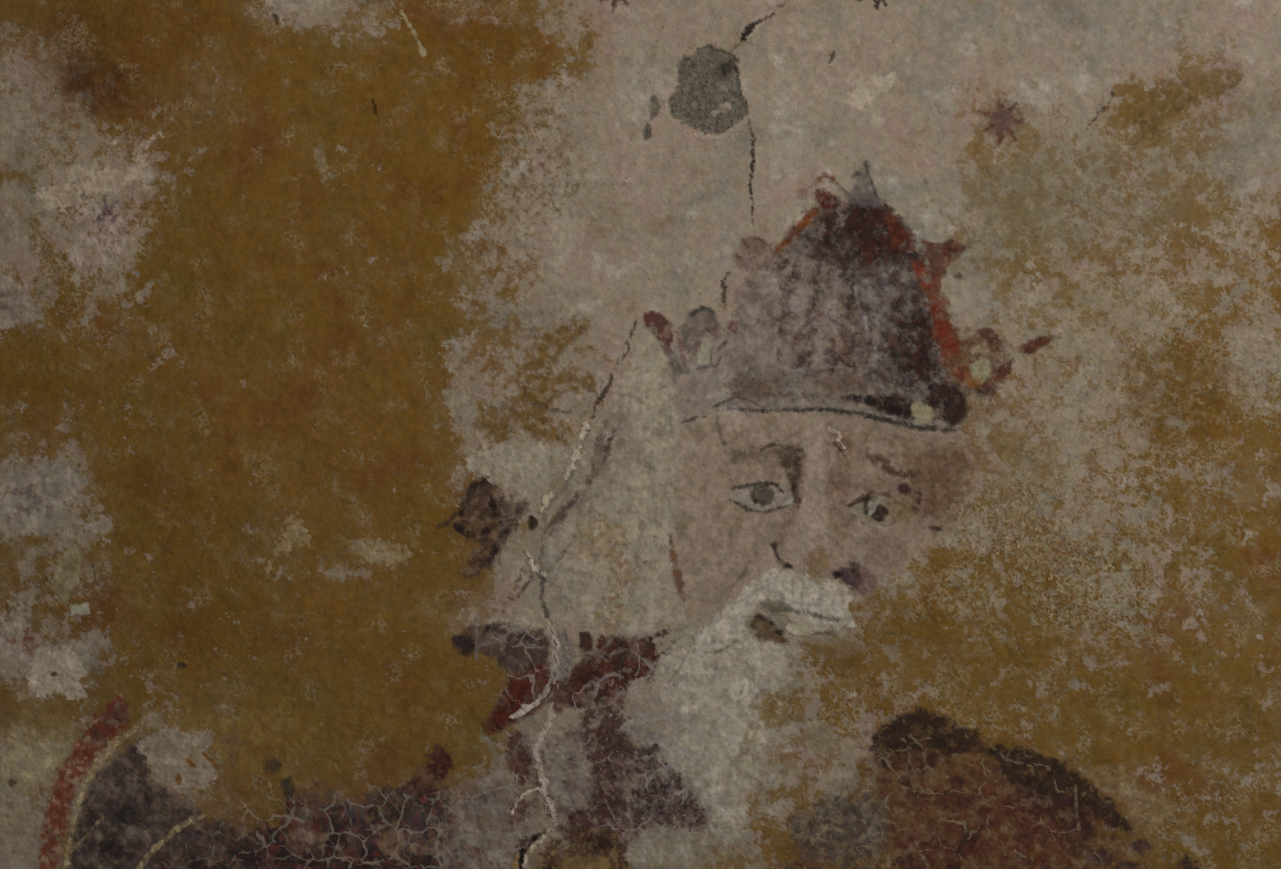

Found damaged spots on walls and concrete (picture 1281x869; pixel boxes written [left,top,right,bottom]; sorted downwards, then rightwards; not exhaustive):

crack [730,0,789,53]
leakage [1124,58,1248,151]
crack [744,114,759,225]
leakage [979,148,1094,279]
leakage [1117,337,1241,457]
crack [131,320,707,869]